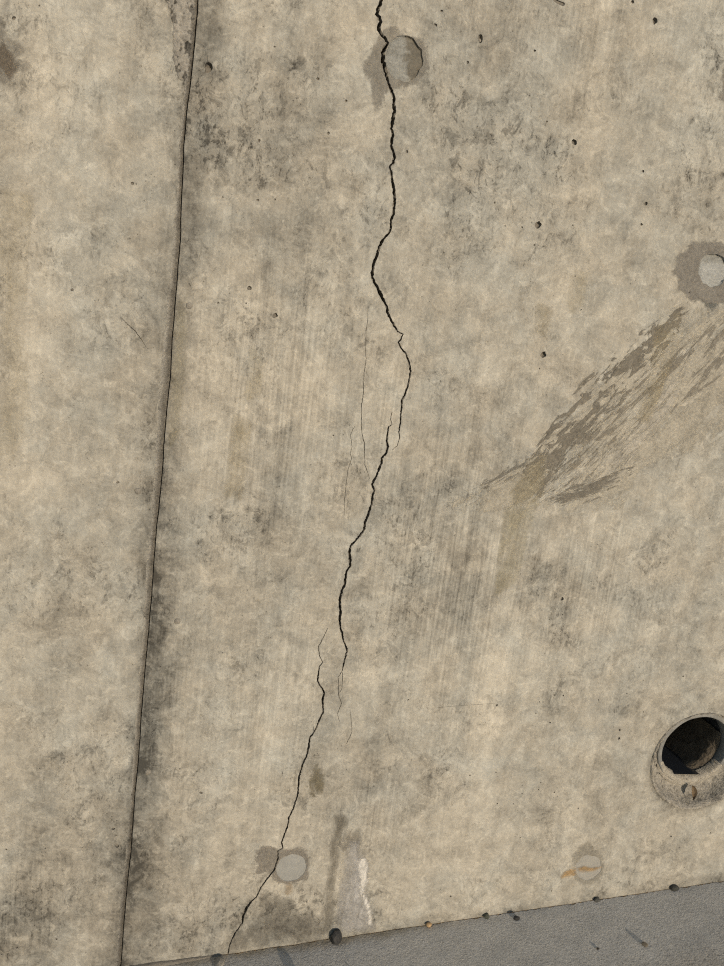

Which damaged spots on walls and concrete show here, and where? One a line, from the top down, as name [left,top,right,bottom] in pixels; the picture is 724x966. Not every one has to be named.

crack [227,0,412,954]
leakage [340,842,372,931]